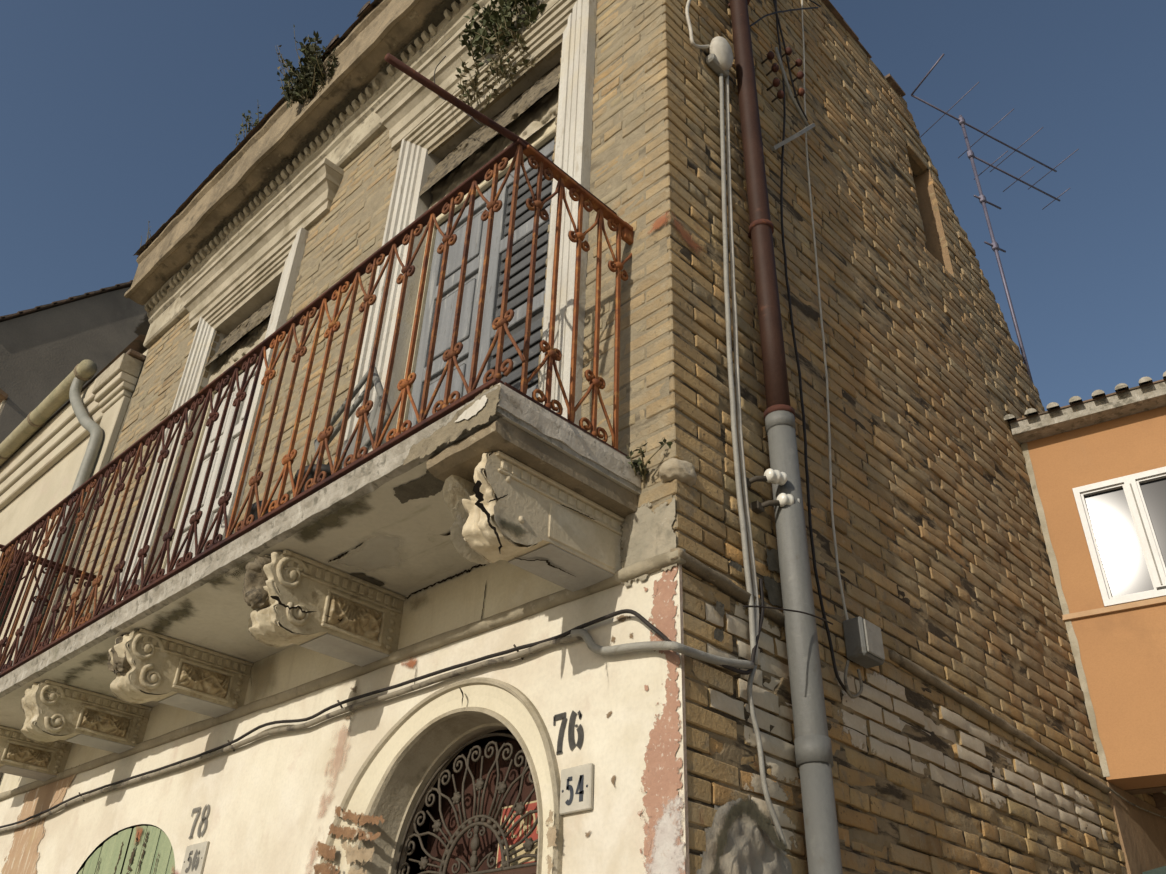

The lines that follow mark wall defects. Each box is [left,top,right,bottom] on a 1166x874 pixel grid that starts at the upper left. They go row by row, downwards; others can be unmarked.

spalling [393,384,501,504]
crack [270,596,344,622]
crack [406,480,576,619]
peeling [638,564,685,874]
peeling [1,764,80,874]
flaking render [313,806,384,874]